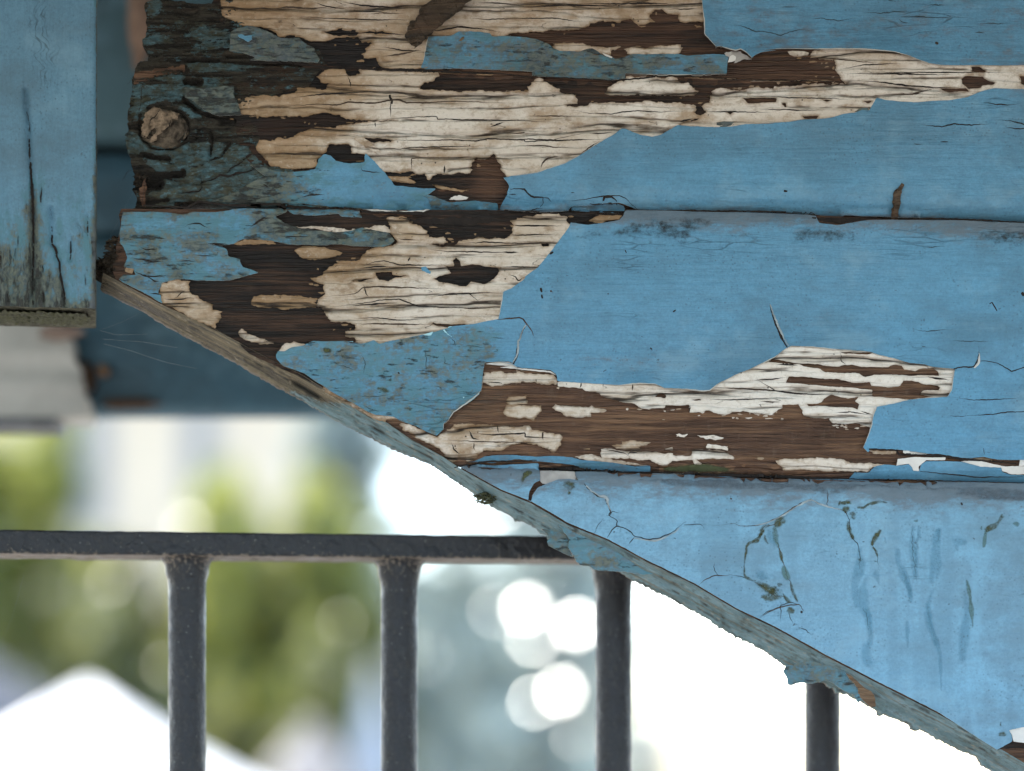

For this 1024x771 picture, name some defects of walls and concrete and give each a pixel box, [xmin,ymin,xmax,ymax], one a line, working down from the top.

peeling [159,0,1024,484]
crack [769,303,789,347]
crack [918,329,1024,372]
crack [954,397,1024,417]
crack [454,448,1024,633]